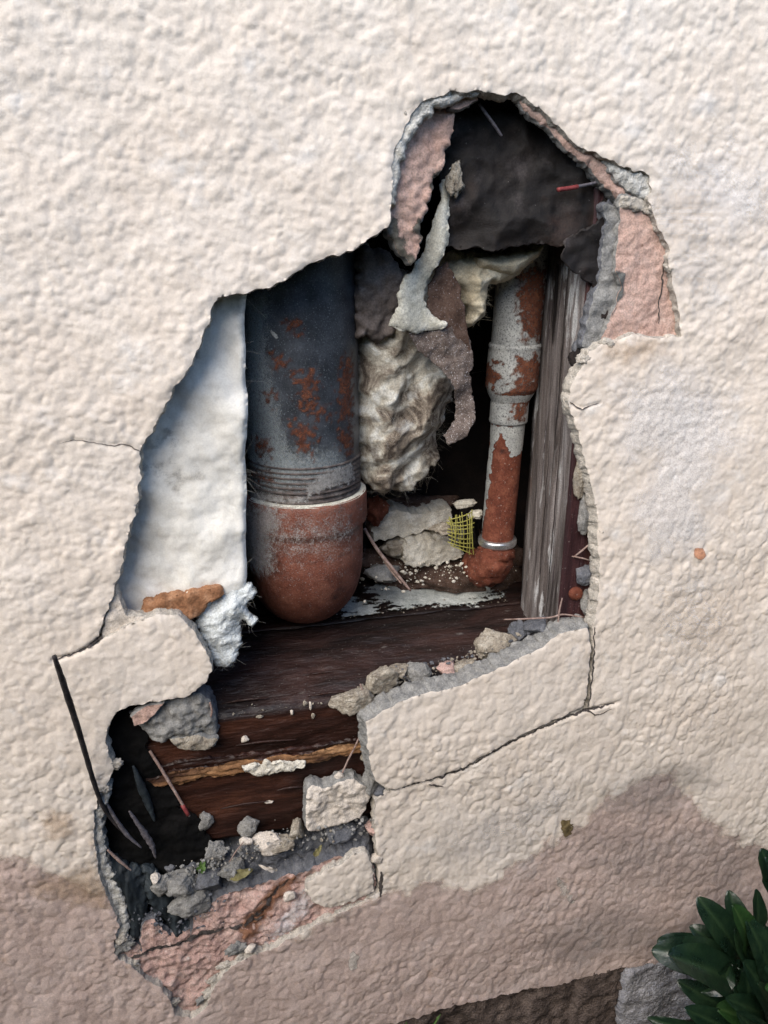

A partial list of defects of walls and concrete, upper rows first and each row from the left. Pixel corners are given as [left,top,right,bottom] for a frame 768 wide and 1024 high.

crack [63,440,139,451]
rust [268,349,354,458]
rust [485,260,547,423]
spalling [92,90,681,1019]
crack [402,628,614,788]